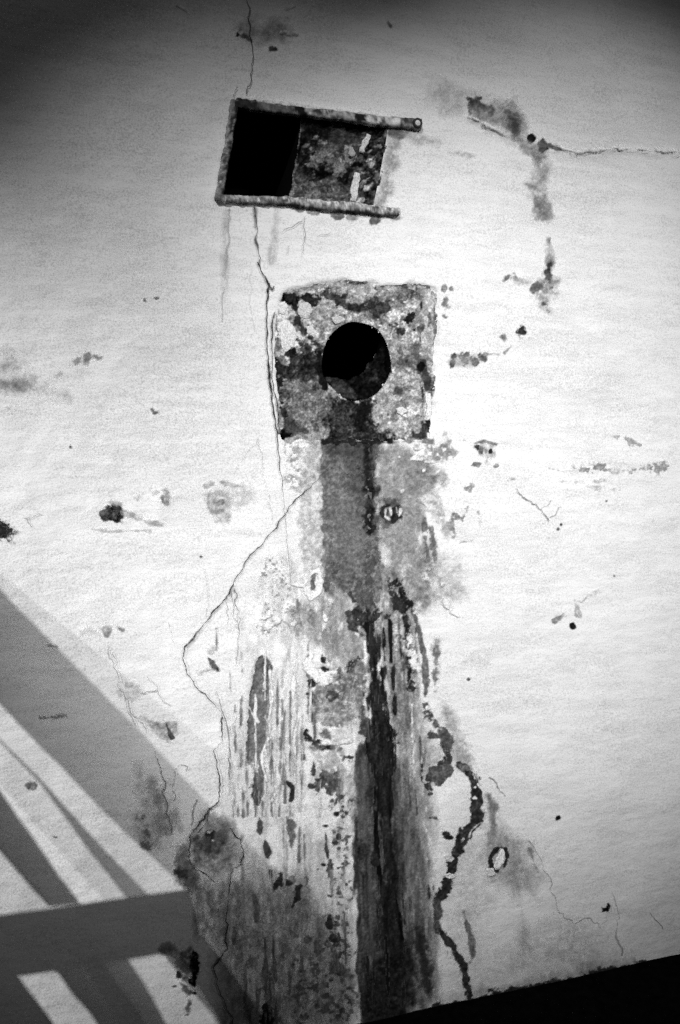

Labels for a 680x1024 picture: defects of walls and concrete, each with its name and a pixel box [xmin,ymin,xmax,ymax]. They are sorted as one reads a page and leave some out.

crack [233,2,254,97]
damp [375,128,431,206]
damp [467,96,562,220]
damp [505,238,559,312]
damp [450,325,527,368]
crack [107,206,329,1024]
damp [283,436,481,1023]
peeling [218,557,370,1024]
damp [486,794,532,885]